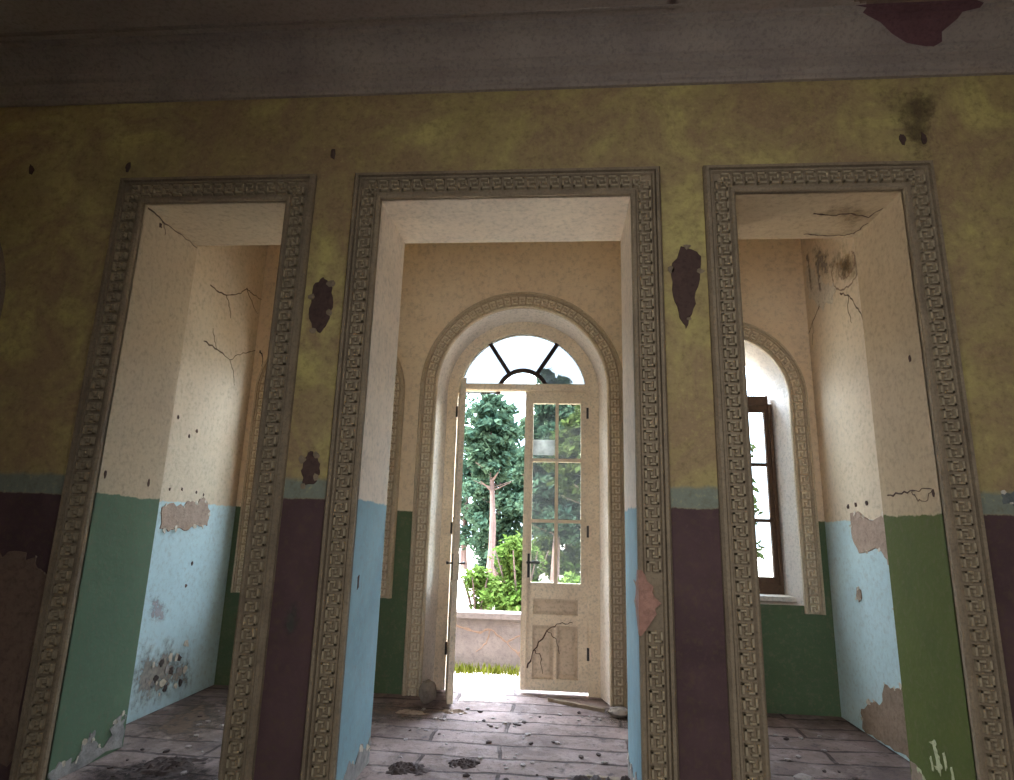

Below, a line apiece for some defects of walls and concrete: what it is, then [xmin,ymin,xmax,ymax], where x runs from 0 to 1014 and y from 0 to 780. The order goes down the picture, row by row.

crack [804,223,868,236]
crack [204,285,263,385]
flaking render [308,277,335,333]
flaking render [668,244,705,328]
crack [808,293,862,341]
peeling [160,497,210,534]
peeling [849,511,889,565]
peeling [135,640,189,700]
flaking render [47,710,127,780]
flaking render [861,682,955,780]